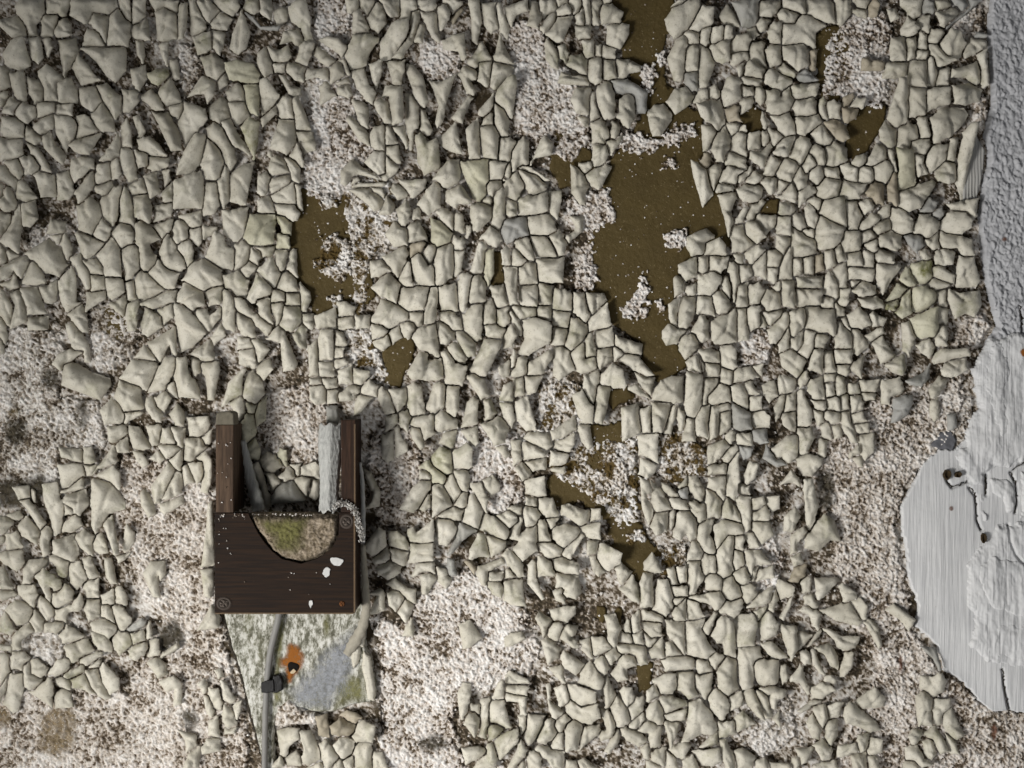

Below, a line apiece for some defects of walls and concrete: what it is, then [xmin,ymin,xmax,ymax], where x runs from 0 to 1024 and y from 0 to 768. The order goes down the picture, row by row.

flaking render [0,0,288,768]
peeling [189,0,990,768]
crack [946,462,1024,530]
crack [220,614,262,764]
rust [279,643,303,682]
crack [377,700,385,735]
flaking render [812,670,1024,768]